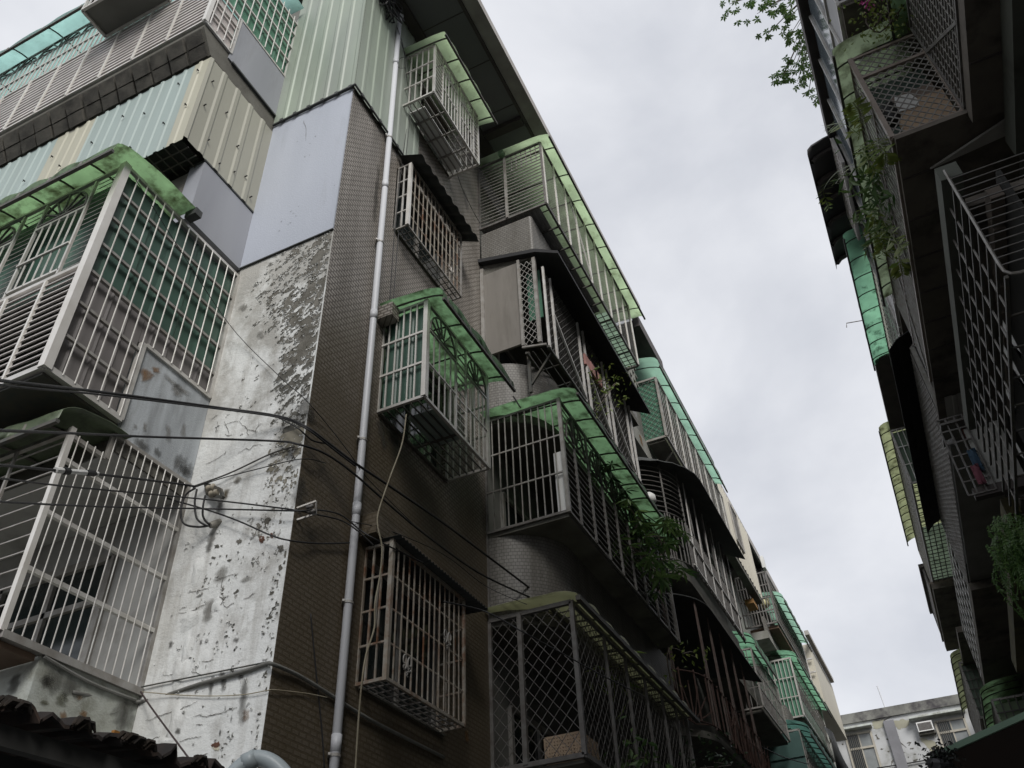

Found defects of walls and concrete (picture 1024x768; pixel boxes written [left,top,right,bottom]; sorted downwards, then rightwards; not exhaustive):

peeling [211,730,235,764]
peeling [172,231,332,750]